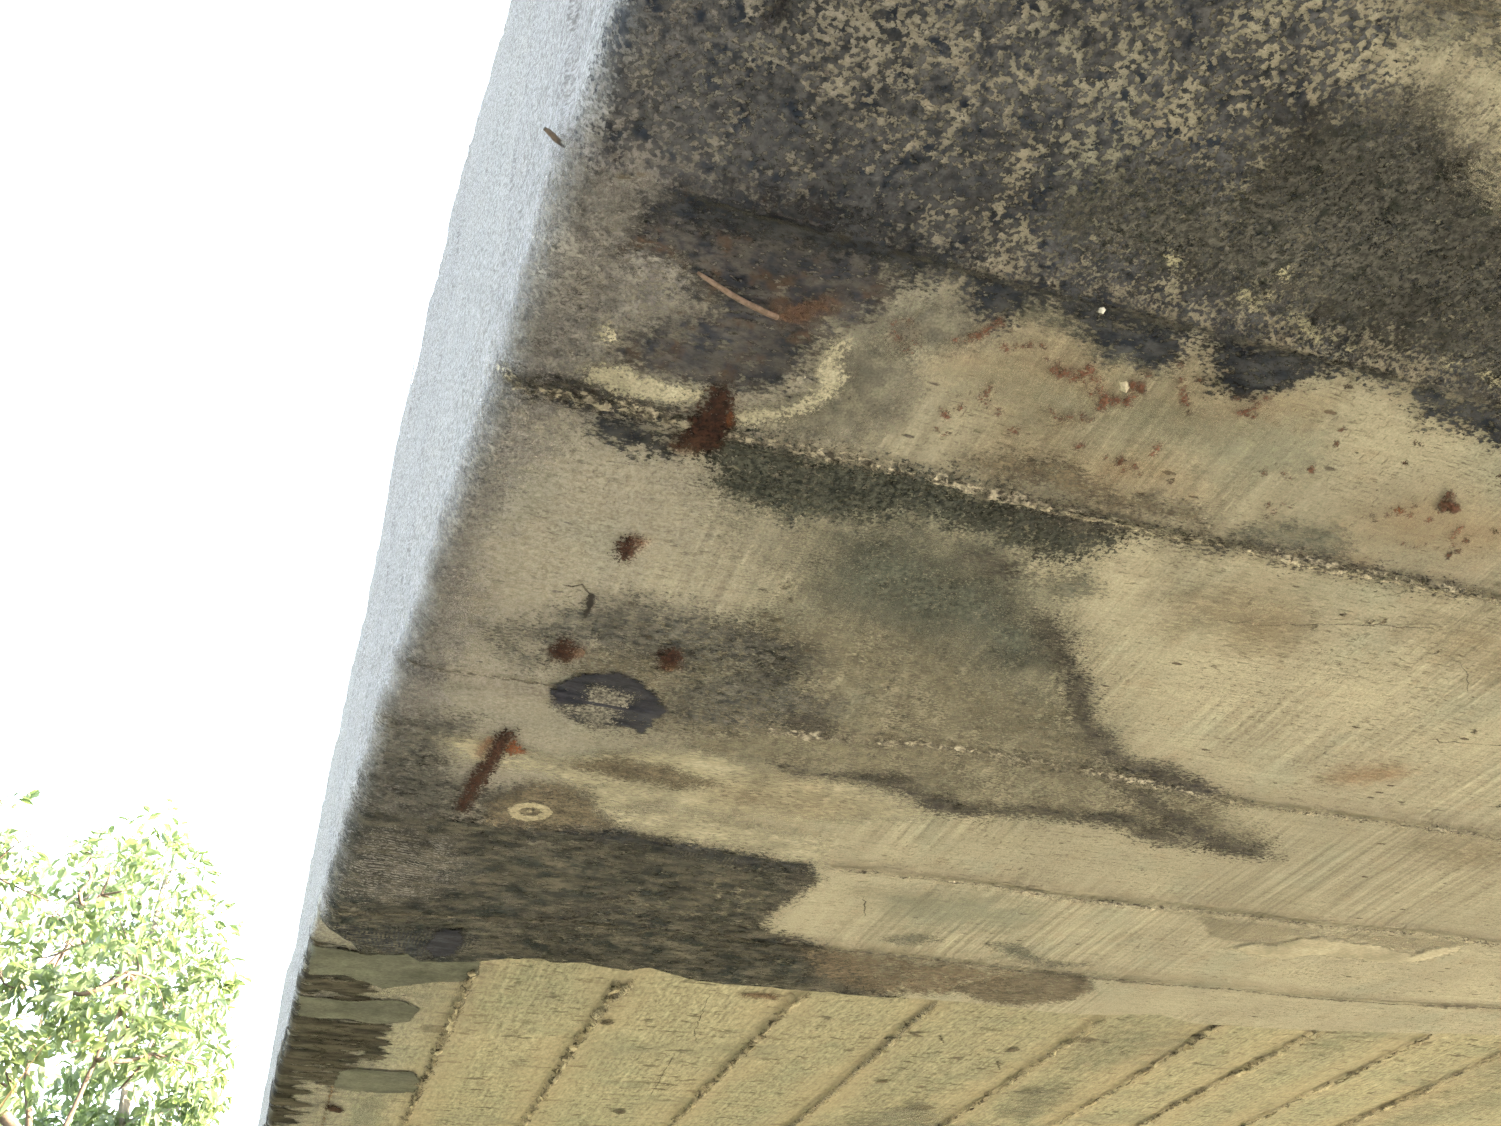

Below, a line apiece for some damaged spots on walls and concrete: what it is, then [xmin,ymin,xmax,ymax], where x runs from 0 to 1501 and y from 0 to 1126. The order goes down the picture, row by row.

corrosion [666,379,739,457]
corrosion [935,383,1020,437]
corrosion [952,315,1152,424]
corrosion [1176,362,1205,416]
corrosion [1104,441,1163,478]
corrosion [607,533,650,563]
corrosion [1373,491,1470,560]
corrosion [541,636,584,663]
corrosion [651,647,690,672]
corrosion [454,727,526,813]
leakage [883,934,945,946]
leakage [984,942,1090,969]